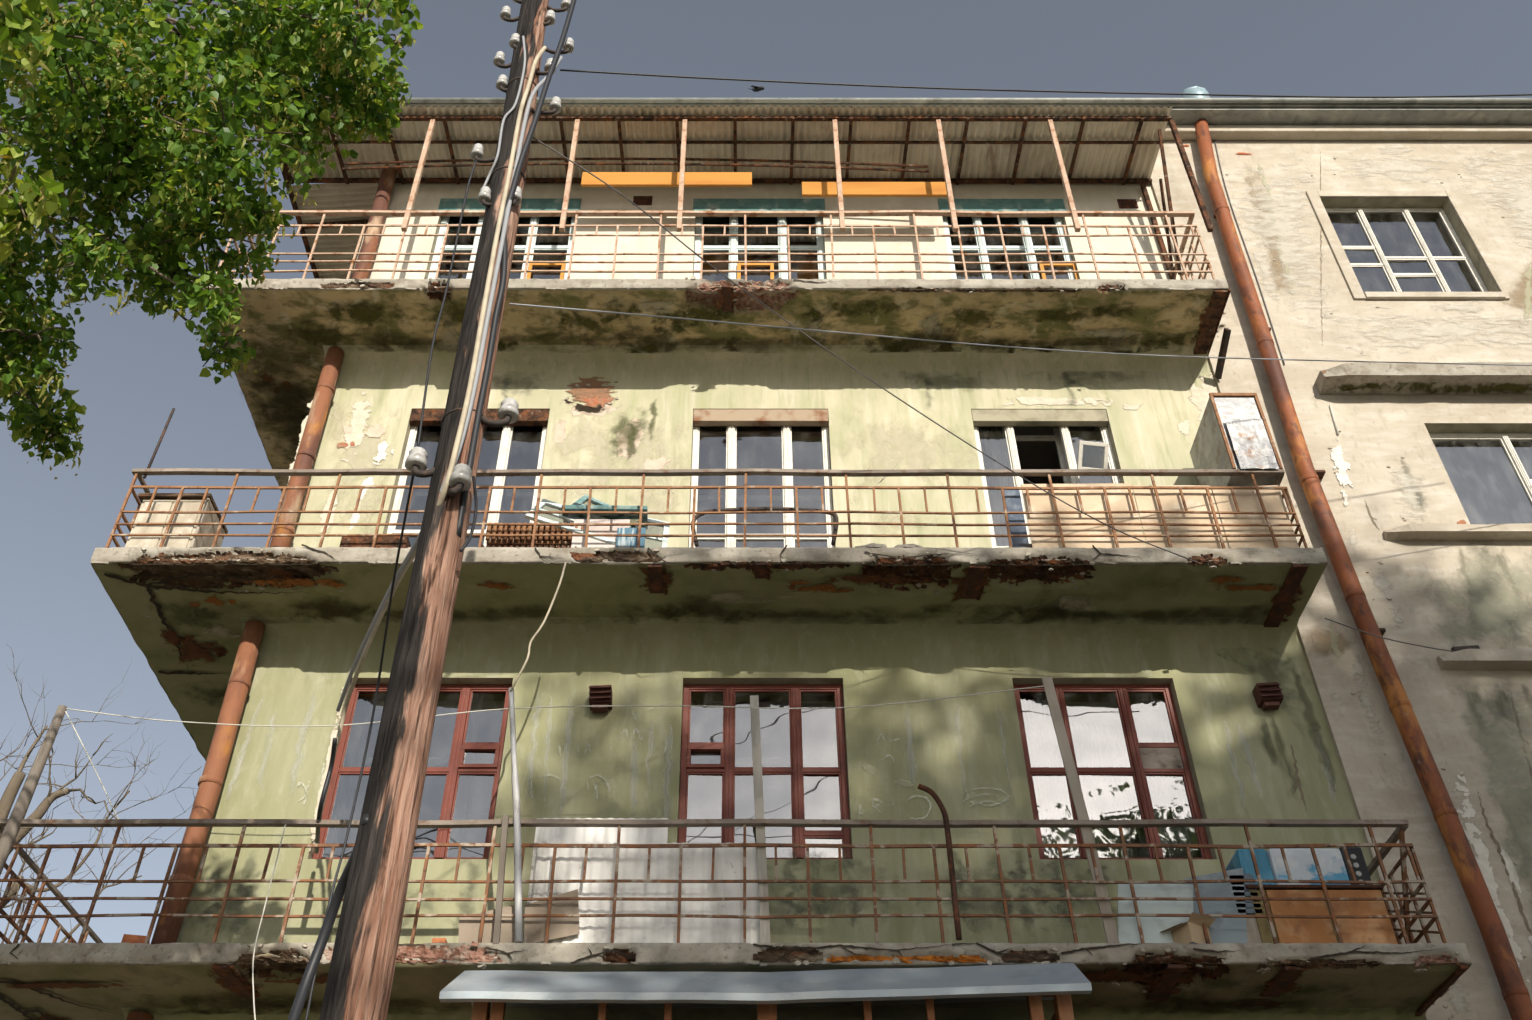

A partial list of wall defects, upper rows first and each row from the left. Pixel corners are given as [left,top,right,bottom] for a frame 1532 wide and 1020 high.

water stain [375,328,459,352]
water stain [638,328,793,352]
water stain [977,329,1135,351]
peeling [288,400,313,482]
peeling [319,390,394,533]
peeling [553,377,671,529]
spalling [113,547,344,593]
spalling [570,547,663,564]
spalling [684,551,961,594]
spalling [986,552,1096,589]
rust [160,630,226,666]
spalling [234,943,333,985]